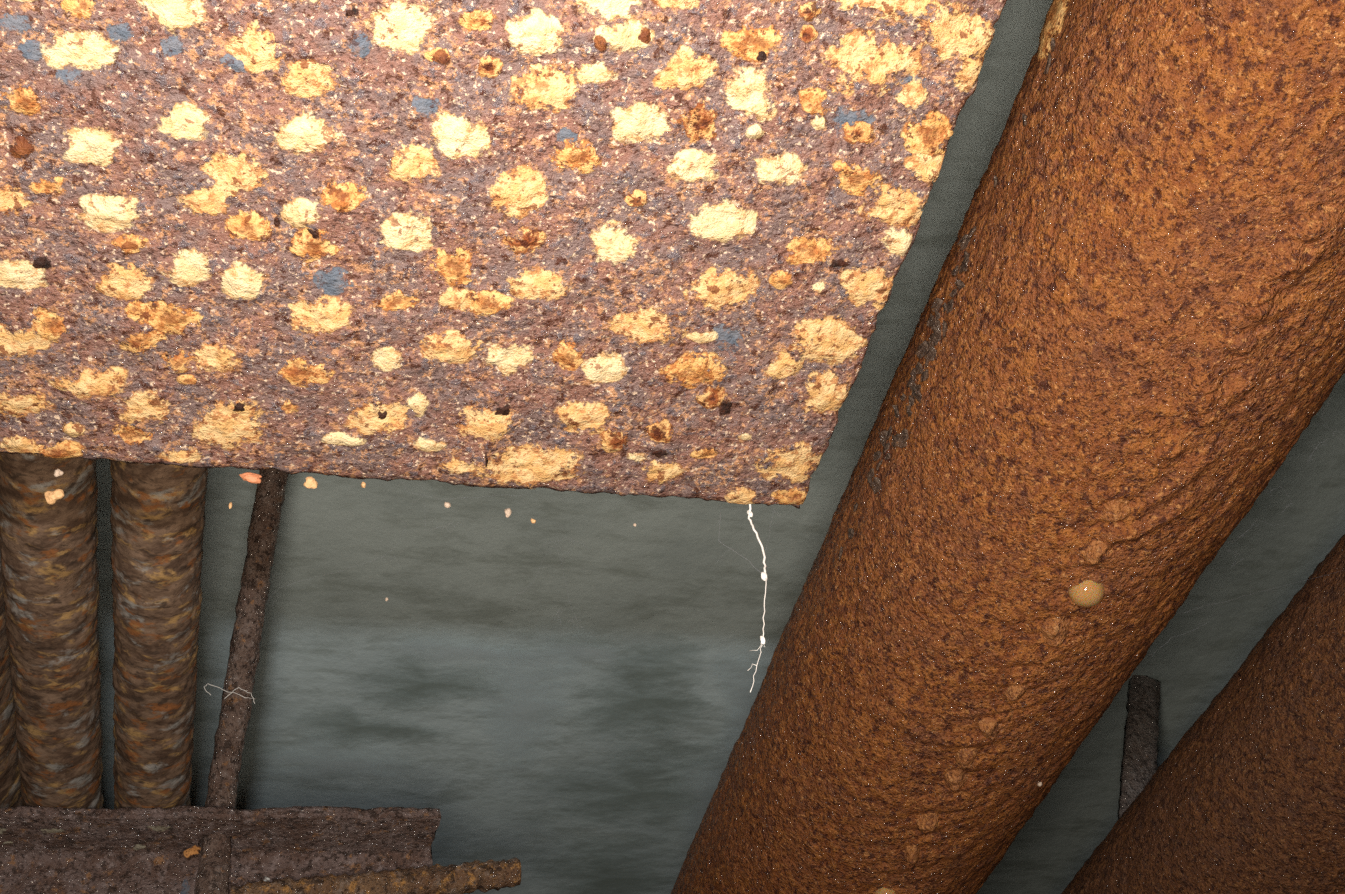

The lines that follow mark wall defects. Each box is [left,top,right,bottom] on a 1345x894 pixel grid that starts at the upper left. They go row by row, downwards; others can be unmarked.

corrosion [225,20,342,156]
corrosion [459,0,700,114]
corrosion [610,0,995,256]
spalling [32,257,51,269]
corrosion [0,177,266,385]
corrosion [177,150,368,267]
corrosion [372,138,603,316]
spalling [830,259,850,267]
corrosion [413,405,585,489]
spalling [495,404,510,415]
spalling [719,400,732,415]
corrosion [764,315,868,414]